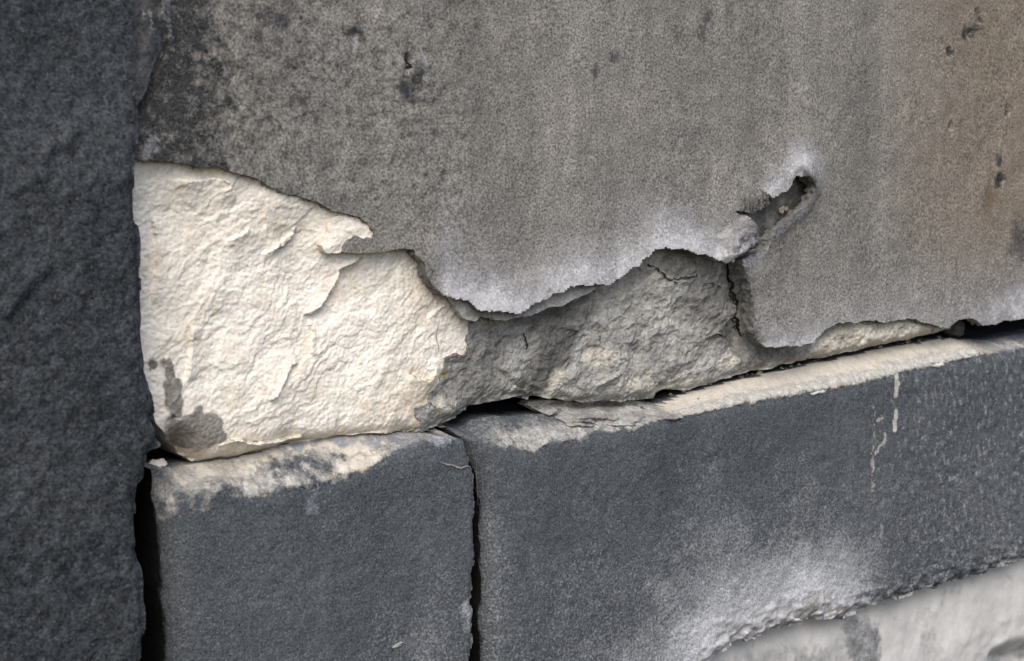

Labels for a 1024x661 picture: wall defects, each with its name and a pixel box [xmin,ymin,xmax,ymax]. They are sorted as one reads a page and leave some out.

spalling [132,160,950,468]
damp [871,372,900,487]